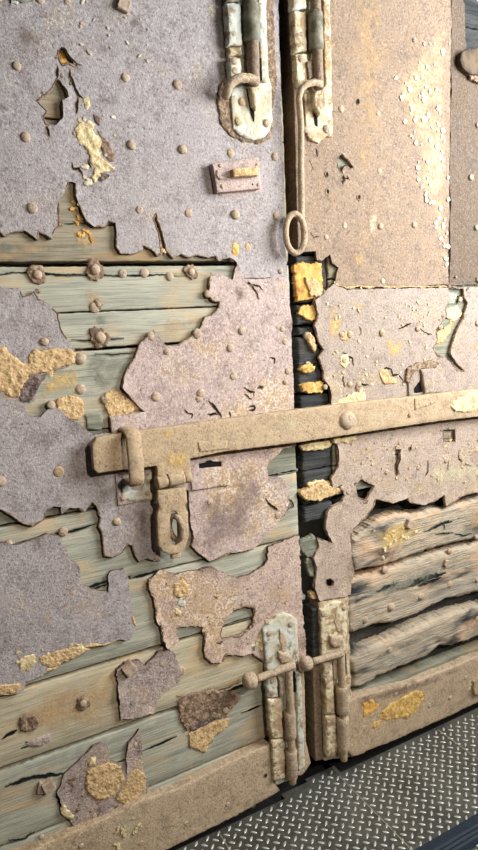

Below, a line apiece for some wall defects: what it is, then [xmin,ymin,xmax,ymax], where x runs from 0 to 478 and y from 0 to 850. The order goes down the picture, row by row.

peeling [232,243,251,256]
corrosion [104,390,141,417]
peeling [173,579,190,616]